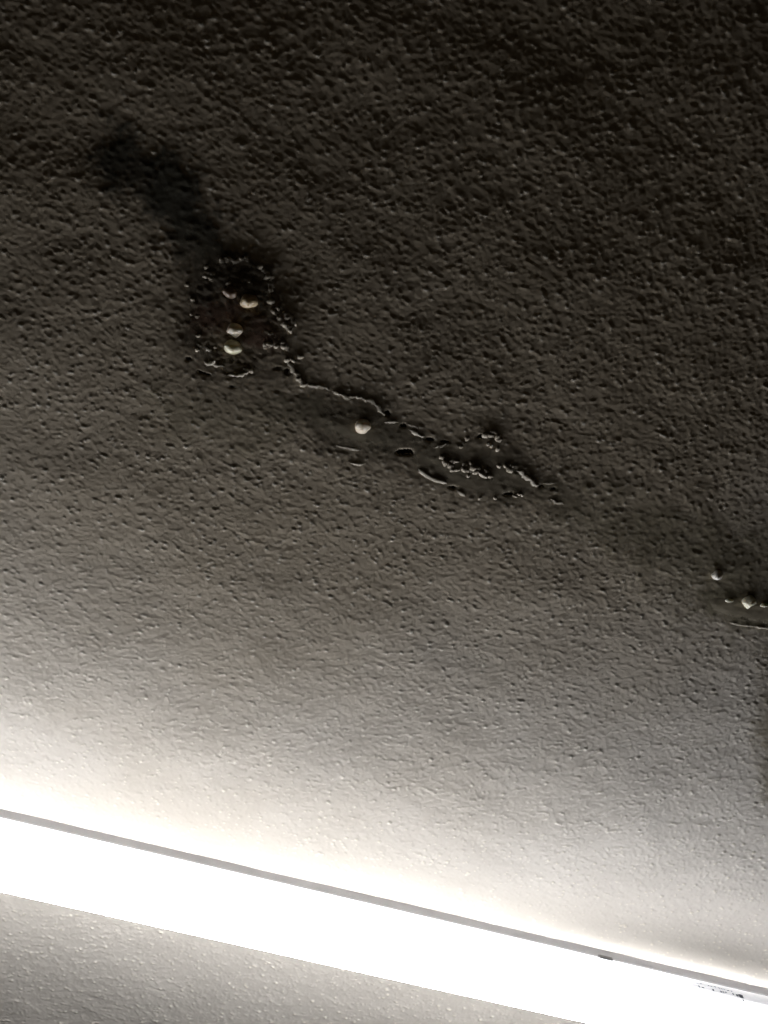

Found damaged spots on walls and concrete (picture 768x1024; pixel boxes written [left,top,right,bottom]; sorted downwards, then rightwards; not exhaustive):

damp [88,122,264,314]
flaking render [181,255,308,388]
peeling [439,430,514,479]